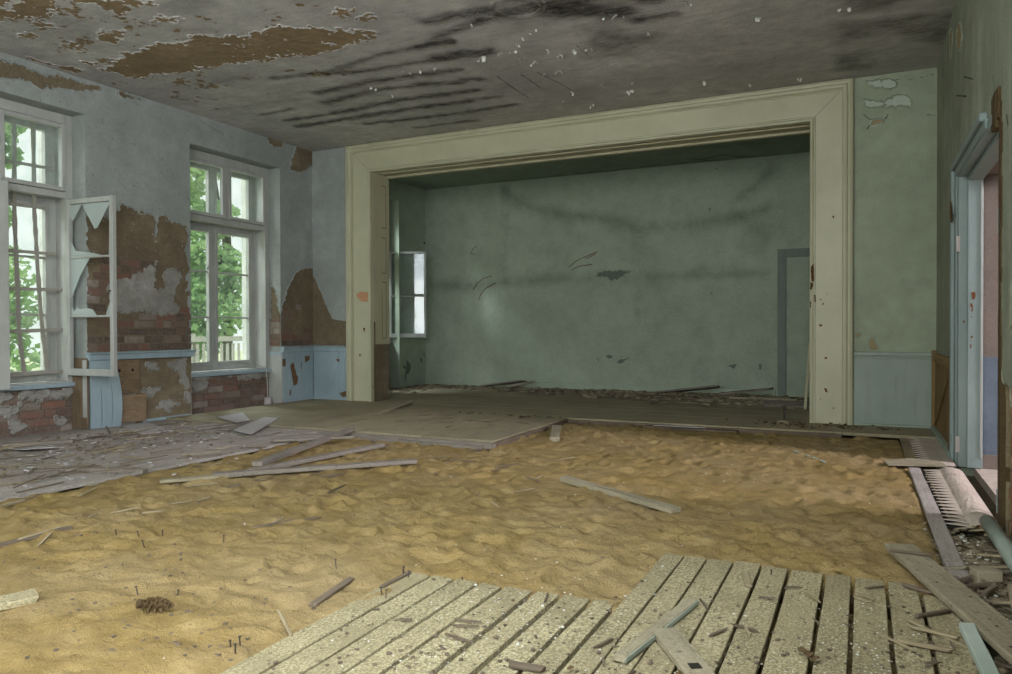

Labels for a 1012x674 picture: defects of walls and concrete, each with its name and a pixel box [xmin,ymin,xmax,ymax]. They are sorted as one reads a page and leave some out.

peeling [0,0,379,113]
peeling [266,137,313,174]
damp [287,0,654,128]
peeling [863,77,914,109]
peeling [86,203,210,423]
peeling [269,267,346,396]